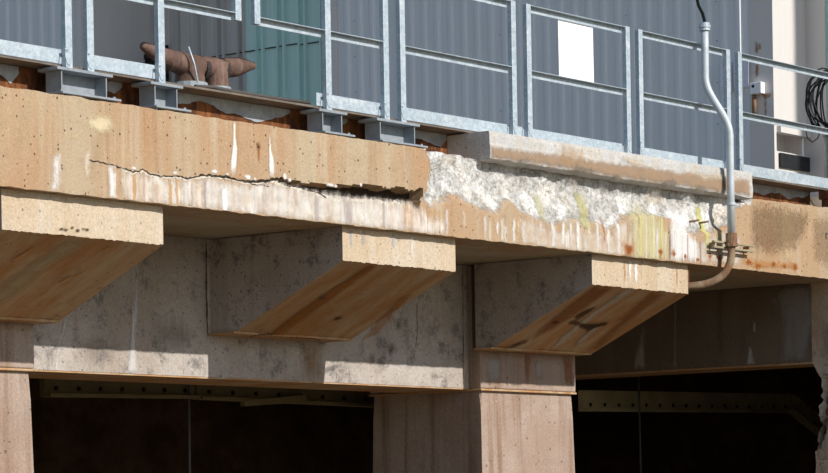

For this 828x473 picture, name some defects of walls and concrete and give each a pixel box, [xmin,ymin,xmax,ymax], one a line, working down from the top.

leakage [52,156,60,189]
crack [90,159,410,212]
leakage [108,137,448,256]
spalling [415,130,809,233]
rust [747,260,798,269]